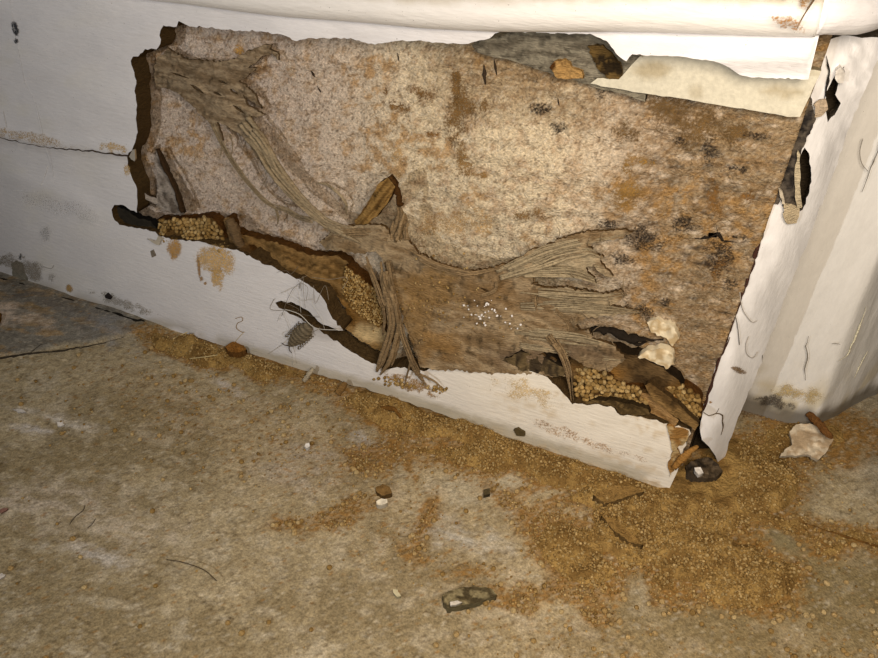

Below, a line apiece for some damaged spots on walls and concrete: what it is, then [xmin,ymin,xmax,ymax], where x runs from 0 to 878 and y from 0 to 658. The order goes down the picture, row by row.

peeling [774,98,828,224]
crack [0,307,145,359]